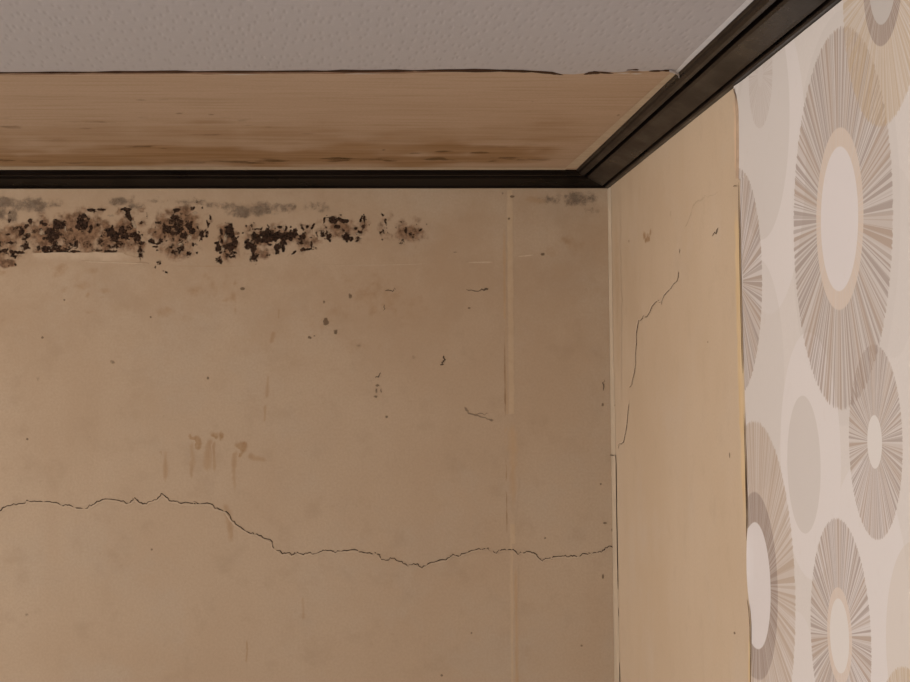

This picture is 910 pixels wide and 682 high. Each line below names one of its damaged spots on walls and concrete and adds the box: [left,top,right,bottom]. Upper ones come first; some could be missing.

damp [0,197,444,361]
crack [612,249,680,456]
crack [0,493,613,570]